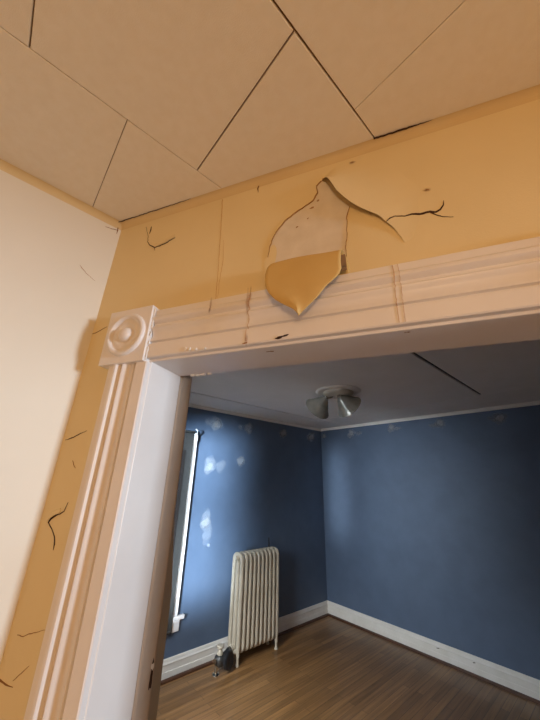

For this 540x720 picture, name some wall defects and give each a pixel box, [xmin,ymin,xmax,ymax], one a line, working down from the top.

crack [374,120,431,139]
crack [107,199,189,250]
flaking render [270,181,349,262]
crack [386,200,449,222]
crack [46,503,68,550]